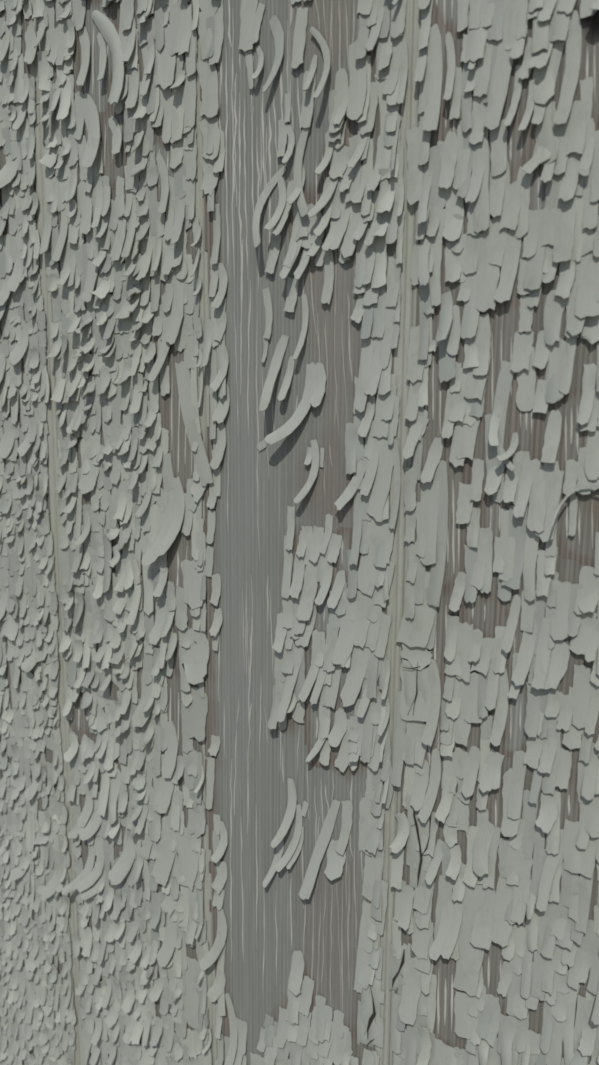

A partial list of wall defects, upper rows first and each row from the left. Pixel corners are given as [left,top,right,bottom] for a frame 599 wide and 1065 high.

peeling [0,0,230,1065]
peeling [204,0,599,1065]